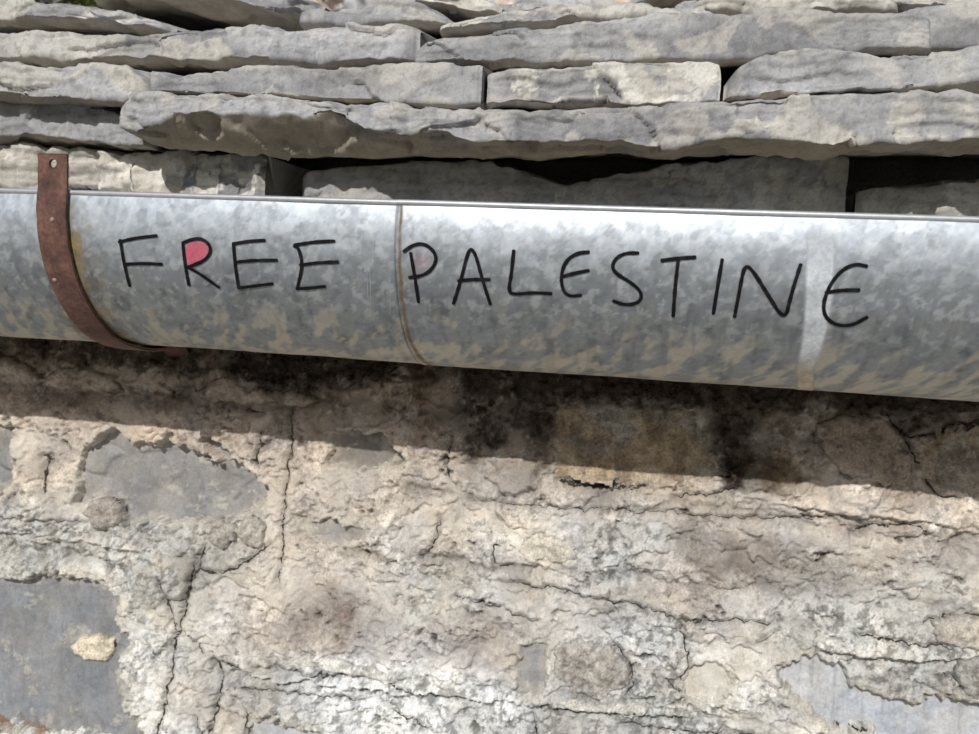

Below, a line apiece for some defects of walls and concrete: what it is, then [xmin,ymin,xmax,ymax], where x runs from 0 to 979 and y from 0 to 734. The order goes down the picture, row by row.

corrosion [69,231,142,345]
leakage [0,239,979,491]
spalling [0,424,17,494]
spalling [81,430,269,526]
crack [469,478,824,520]
crack [853,523,927,533]
crack [887,414,979,498]
crack [157,408,364,734]
spalling [0,566,143,734]
crack [390,683,466,728]
spalling [779,654,979,734]